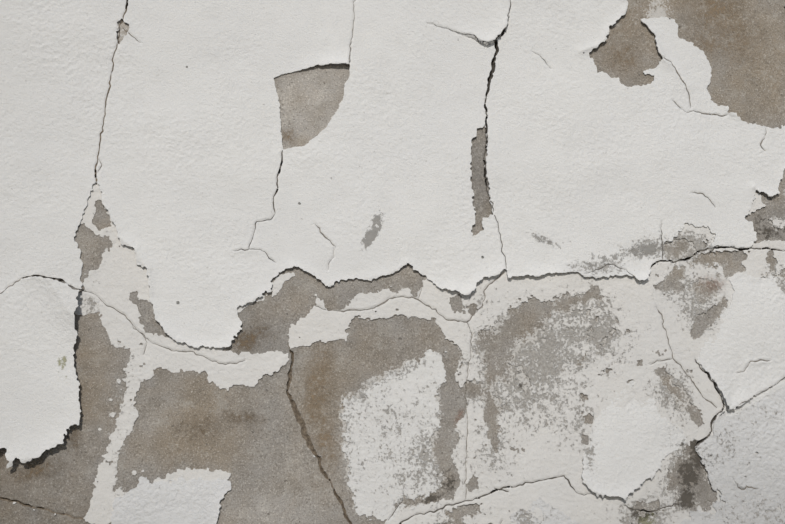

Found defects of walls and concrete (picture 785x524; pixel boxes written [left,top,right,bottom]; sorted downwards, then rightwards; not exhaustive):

crack [94,0,138,185]
peeling [274,35,351,149]
peeling [583,0,785,129]
peeling [74,200,120,290]
crack [0,275,244,365]
peeling [0,263,630,524]
crack [286,345,352,524]
crack [317,0,586,524]
peeling [470,123,493,235]
peeling [580,169,785,517]
crack [592,230,785,281]
crack [652,310,785,448]